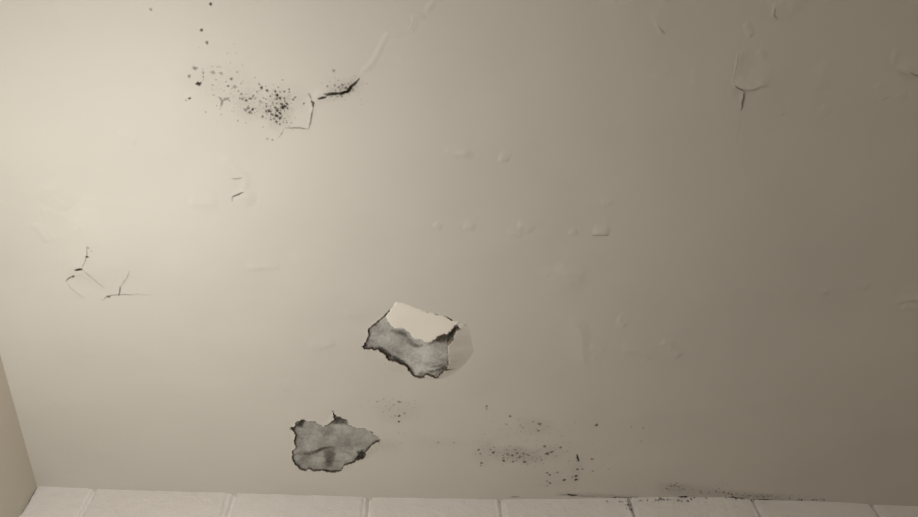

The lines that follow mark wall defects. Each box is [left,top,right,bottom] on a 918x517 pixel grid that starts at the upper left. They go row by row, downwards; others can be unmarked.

peeling [361,302,474,381]
flaking render [289,411,381,473]